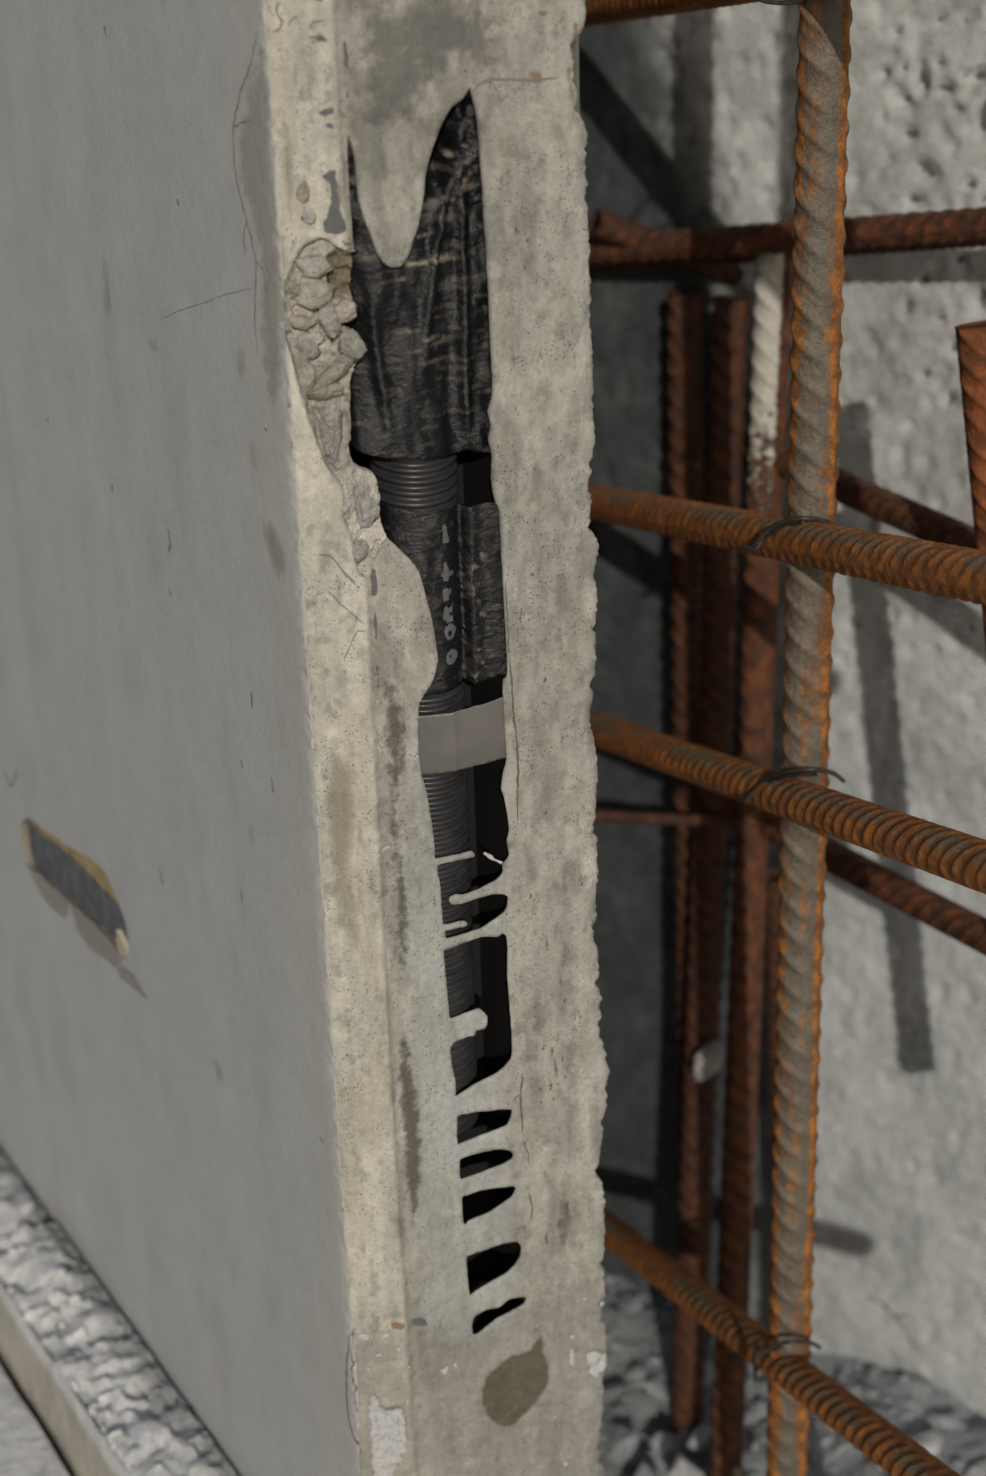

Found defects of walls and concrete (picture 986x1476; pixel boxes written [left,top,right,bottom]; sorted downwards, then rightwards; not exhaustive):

crack [164,2,324,342]
spalling [282,180,386,578]
spalling [28,865,146,998]